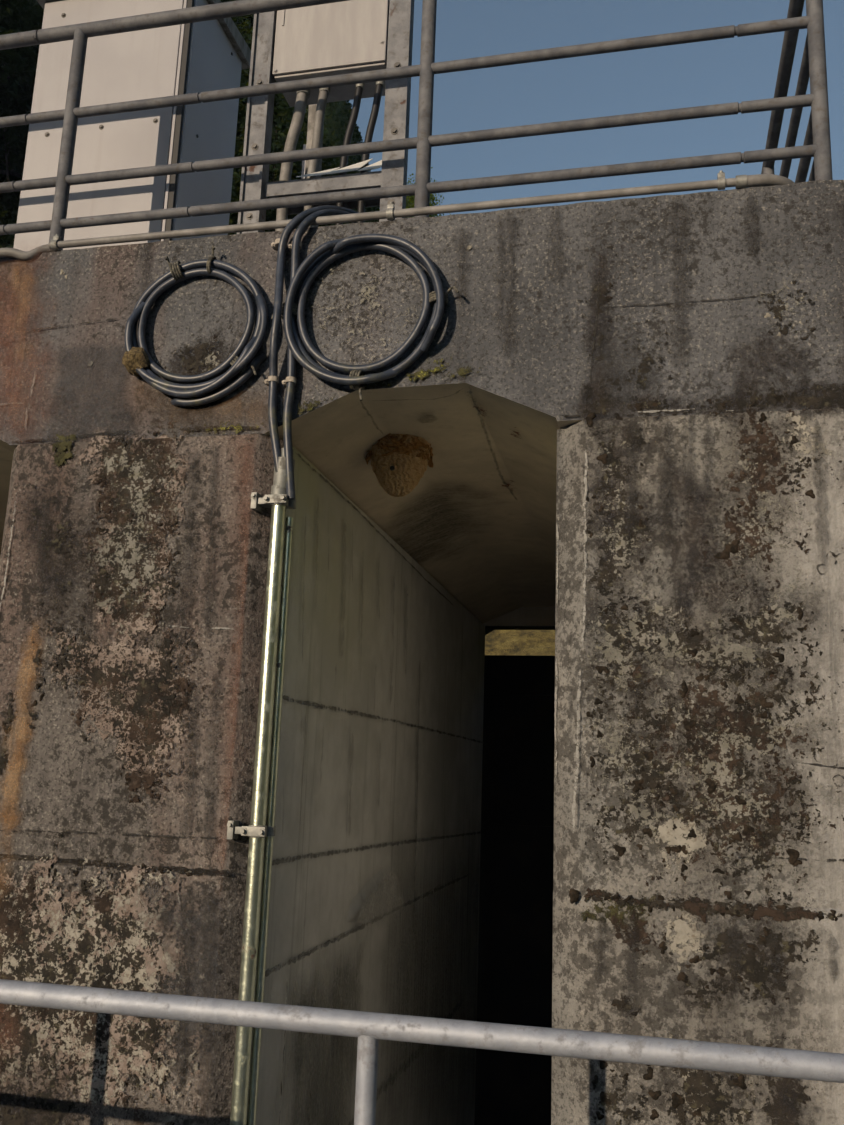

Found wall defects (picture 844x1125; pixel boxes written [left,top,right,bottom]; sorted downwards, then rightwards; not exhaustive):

water stain [579,244,684,413]
crack [604,293,772,308]
water stain [663,398,820,615]
corrosion [1,631,37,826]
peeling [614,744,787,955]
water stain [163,898,216,998]
peeling [569,888,750,998]